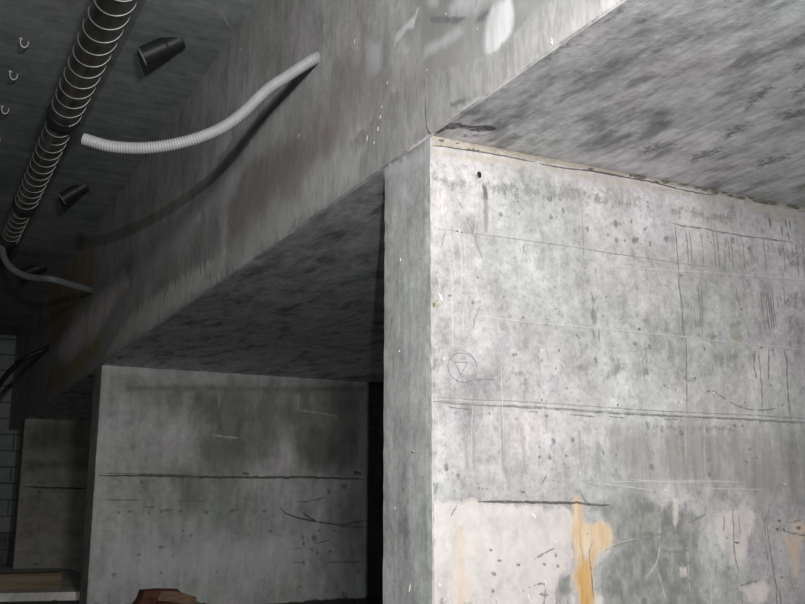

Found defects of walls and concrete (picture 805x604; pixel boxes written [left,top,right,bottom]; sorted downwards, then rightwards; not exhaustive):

crack [25,471,366,563]
rust [572,497,612,604]
leakage [596,416,805,604]